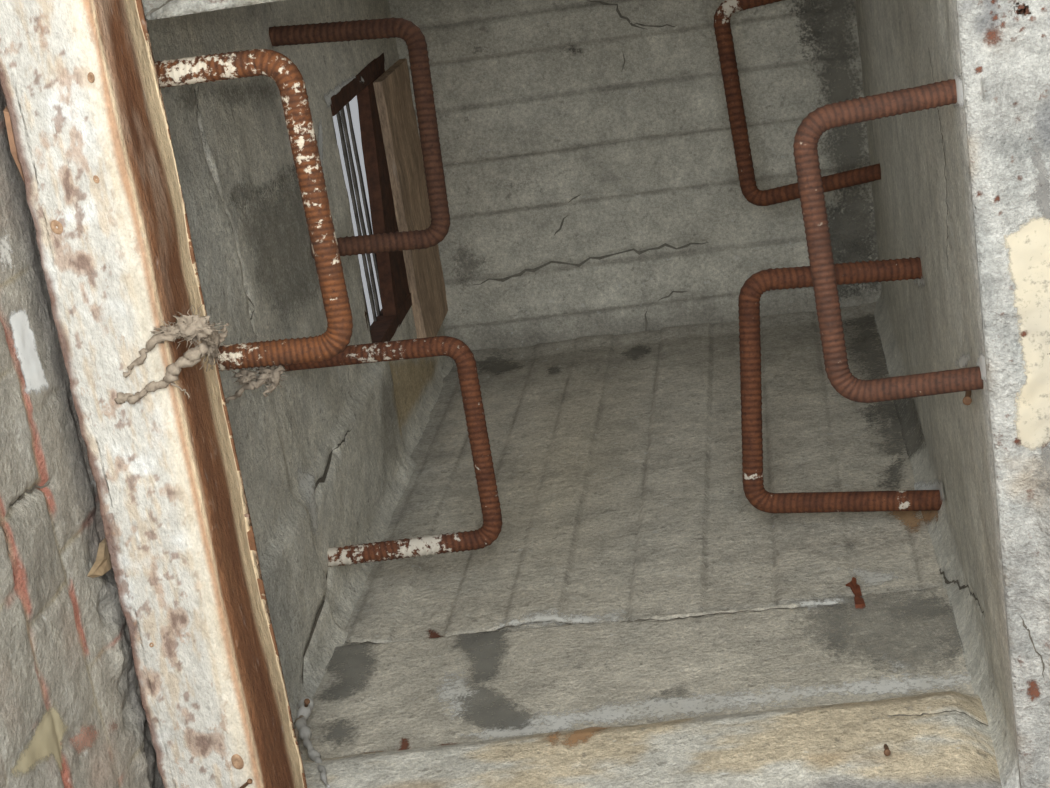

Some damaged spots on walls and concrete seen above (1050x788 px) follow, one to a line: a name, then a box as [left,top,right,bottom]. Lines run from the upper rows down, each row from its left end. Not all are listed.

crack [587,0,675,30]
rust [984,0,1044,45]
water stain [796,0,863,104]
crack [554,194,581,235]
crack [473,242,708,285]
flaking render [1005,145,1050,492]
crack [314,430,351,490]
rust [846,577,866,610]
crack [939,568,985,617]
water stain [320,642,377,700]
water stain [321,719,355,749]